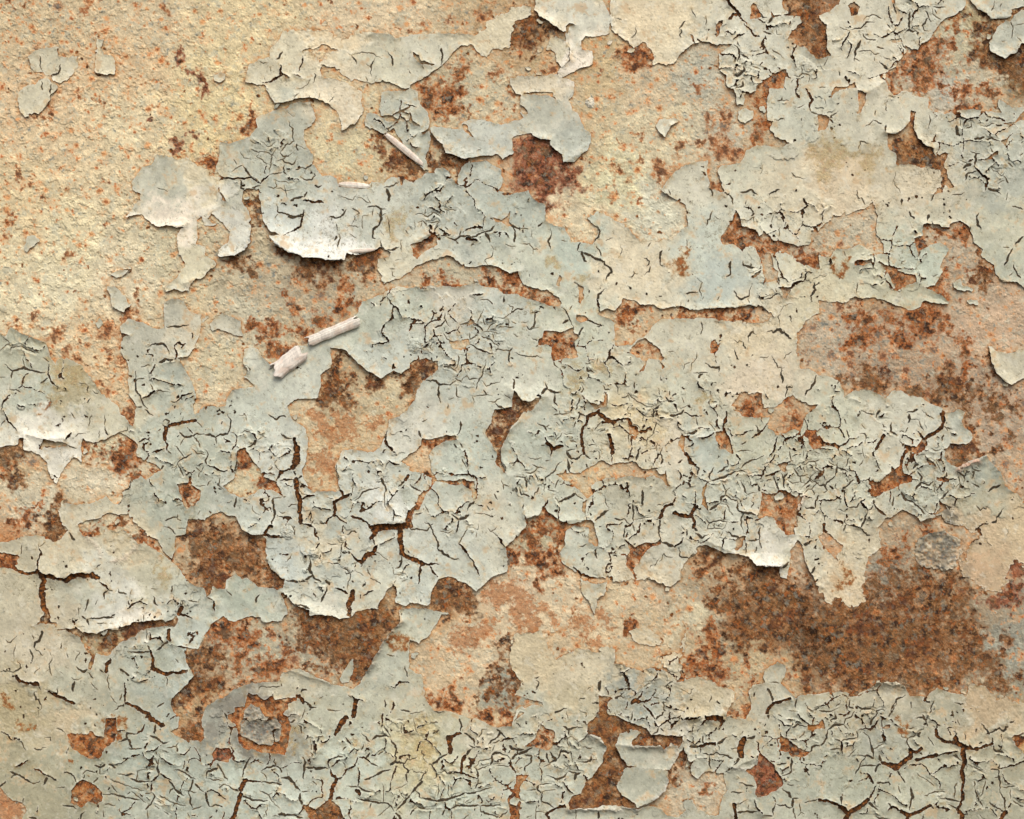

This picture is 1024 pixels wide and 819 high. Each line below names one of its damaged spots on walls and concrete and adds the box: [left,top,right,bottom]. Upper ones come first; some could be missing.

crack [679,0,943,121]
peeling [970,0,1024,58]
corrosion [508,133,586,210]
crack [1,48,1024,615]
corrosion [835,257,1023,482]
peeling [0,626,110,819]
peeling [193,573,288,634]
corrosion [171,605,410,761]
crack [0,538,1024,819]
peeling [84,597,1024,819]
corrosion [564,690,697,810]
corrosion [676,524,1024,719]